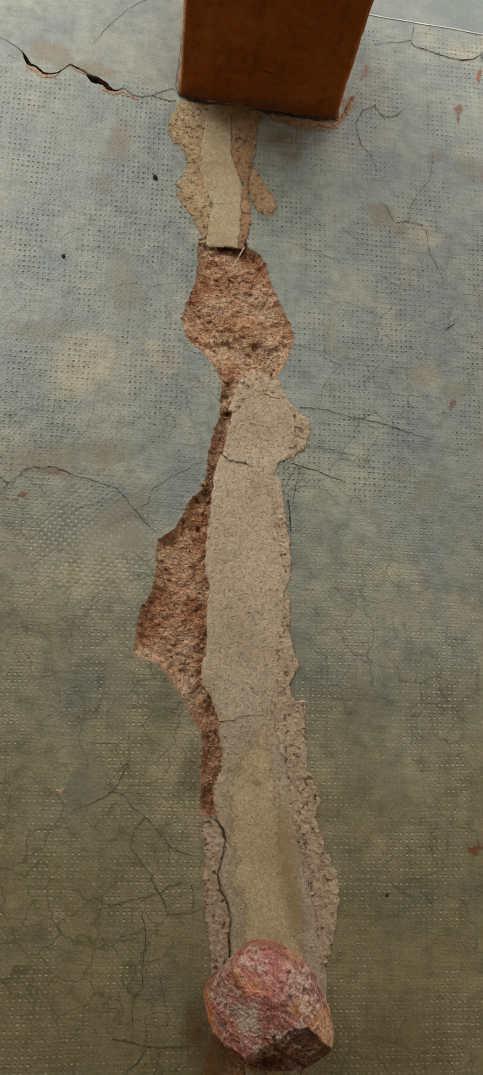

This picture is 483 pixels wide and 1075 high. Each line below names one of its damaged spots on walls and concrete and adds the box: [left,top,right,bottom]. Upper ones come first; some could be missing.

crack [4,37,402,170]
crack [375,27,483,61]
crack [1,454,252,530]
spalling [132,238,295,819]
crack [73,743,231,1075]